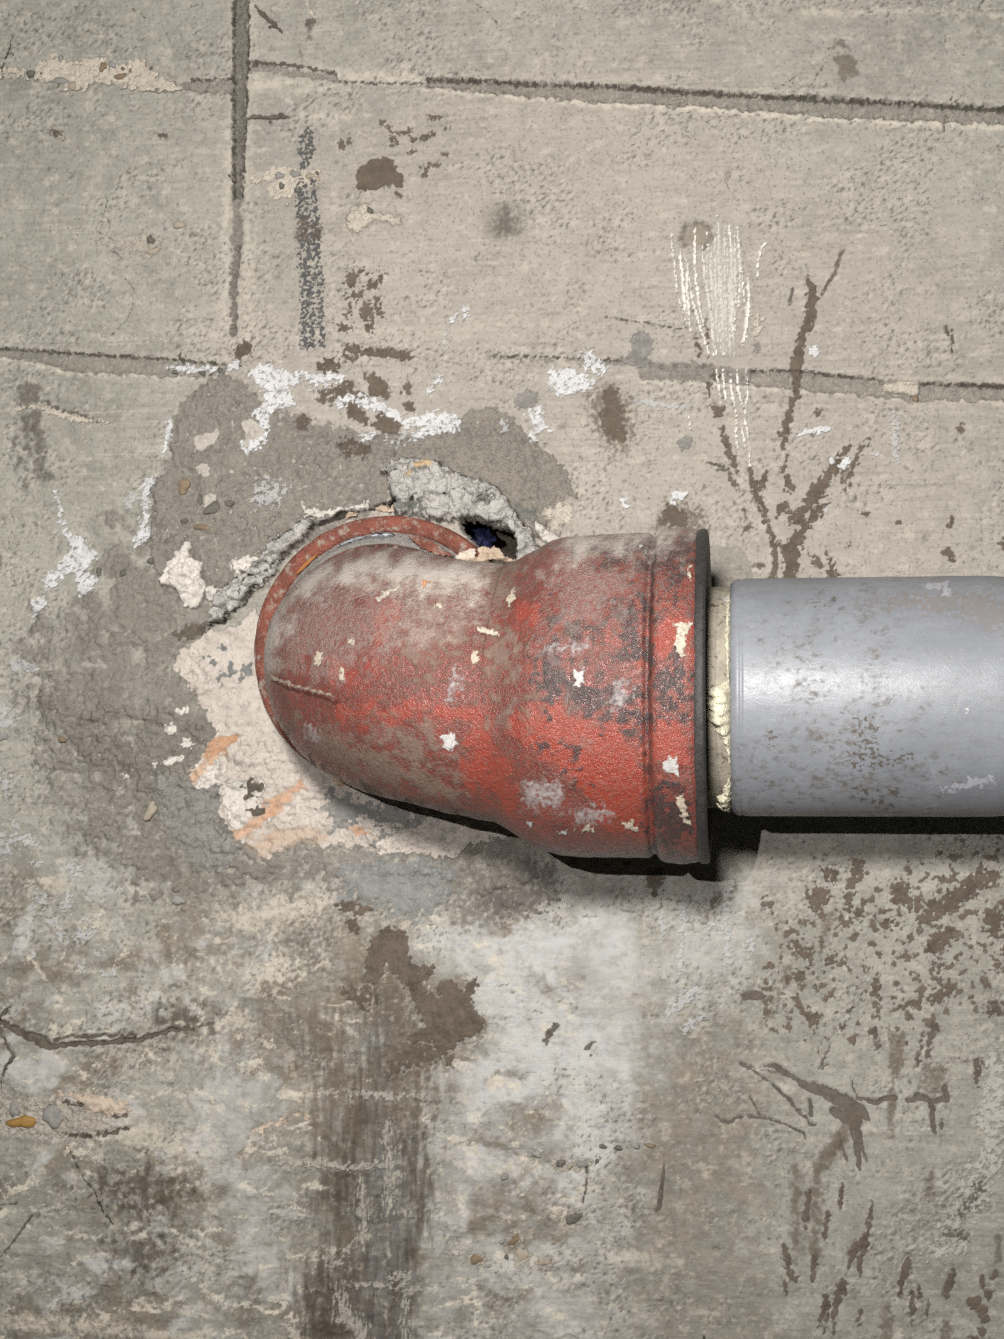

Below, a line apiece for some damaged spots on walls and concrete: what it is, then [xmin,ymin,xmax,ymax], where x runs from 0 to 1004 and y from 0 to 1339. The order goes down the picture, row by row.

damp [161,417,173,454]
damp [166,359,462,455]
damp [523,405,554,443]
damp [547,350,606,397]
damp [718,250,844,578]
damp [124,474,157,549]
damp [245,474,292,513]
spalling [172,456,577,641]
damp [270,977,431,1339]
damp [920,1044,1004,1263]